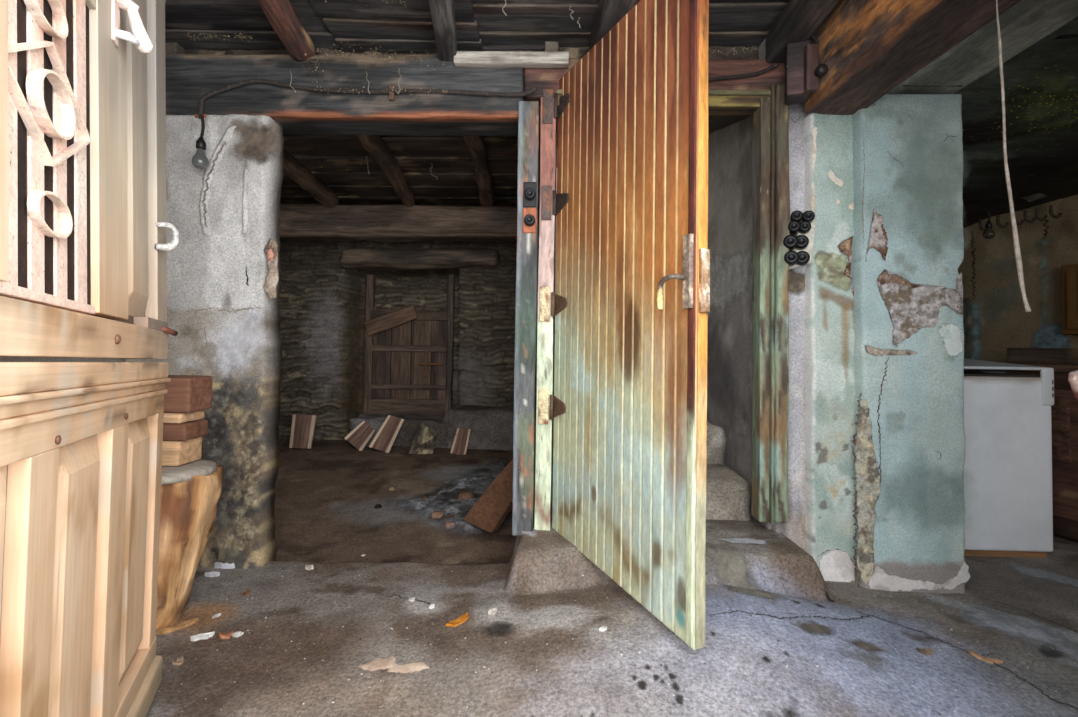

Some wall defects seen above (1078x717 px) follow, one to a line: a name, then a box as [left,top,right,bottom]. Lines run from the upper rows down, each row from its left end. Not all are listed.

spalling [838,237,854,296]
spalling [865,210,981,360]
water stain [200,378,237,529]
crack [705,358,1077,709]
spalling [818,399,970,591]